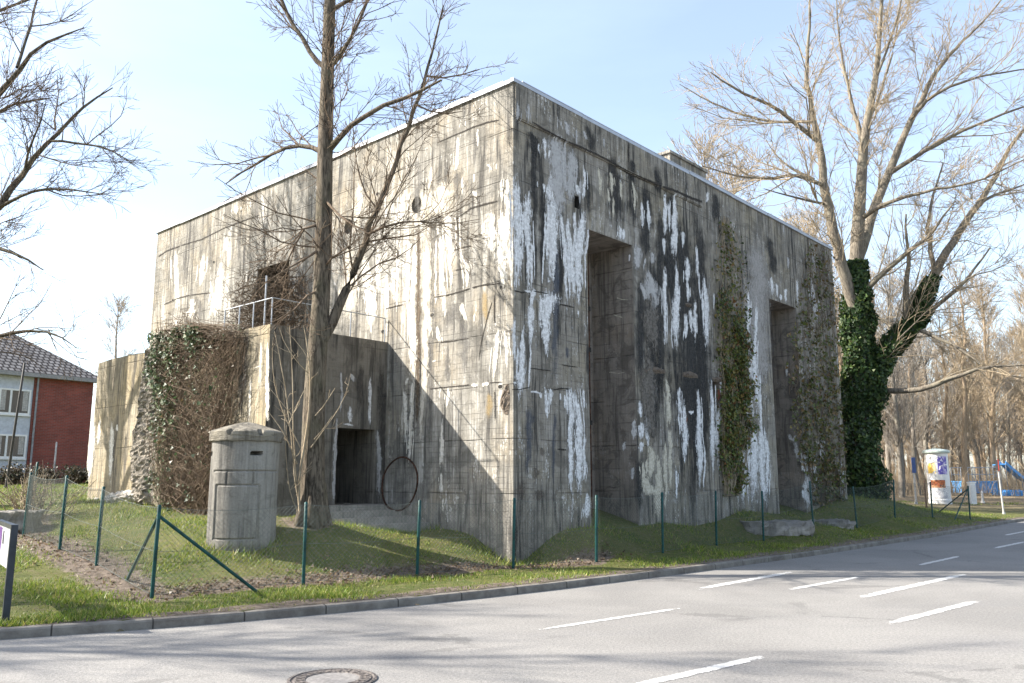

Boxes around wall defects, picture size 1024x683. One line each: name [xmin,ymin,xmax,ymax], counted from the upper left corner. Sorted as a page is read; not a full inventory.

leakage [170,194,267,328]
leakage [471,101,722,522]